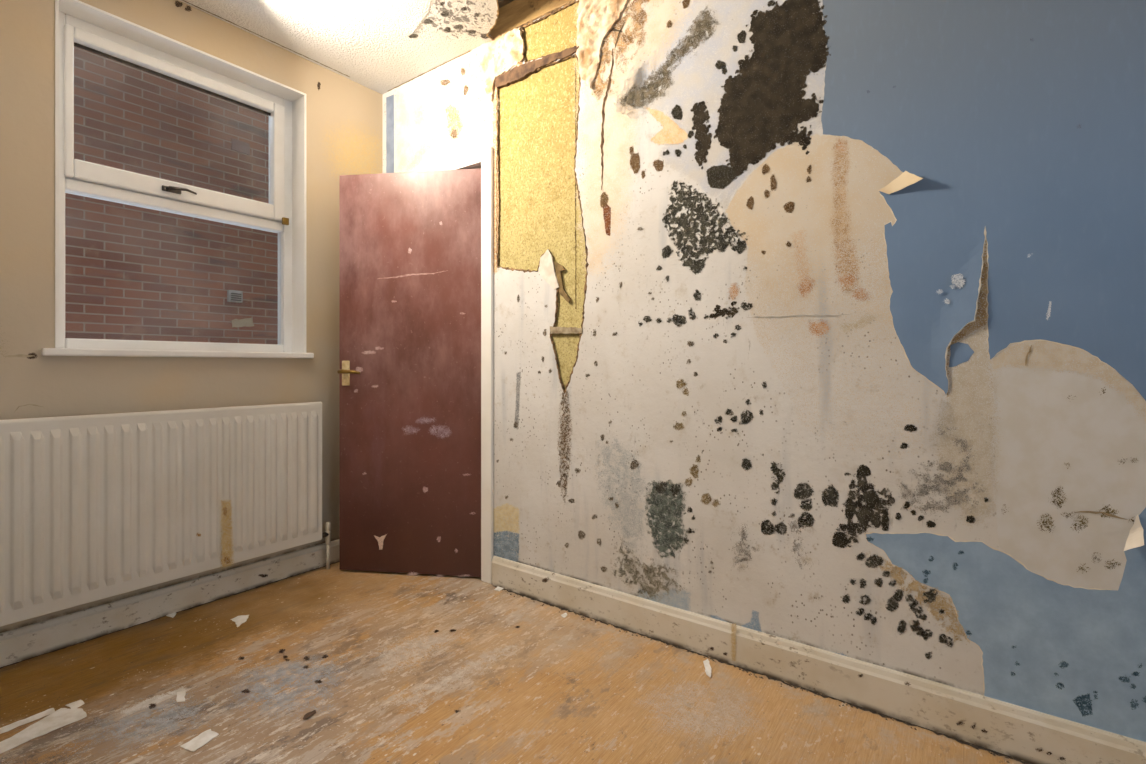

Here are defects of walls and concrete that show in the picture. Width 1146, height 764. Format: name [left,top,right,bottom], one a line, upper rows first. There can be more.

damp [409,0,495,39]
damp [318,52,499,177]
damp [591,0,831,282]
flaking render [472,0,628,500]
damp [676,341,698,396]
damp [638,290,752,343]
damp [565,421,720,603]
damp [728,424,990,659]